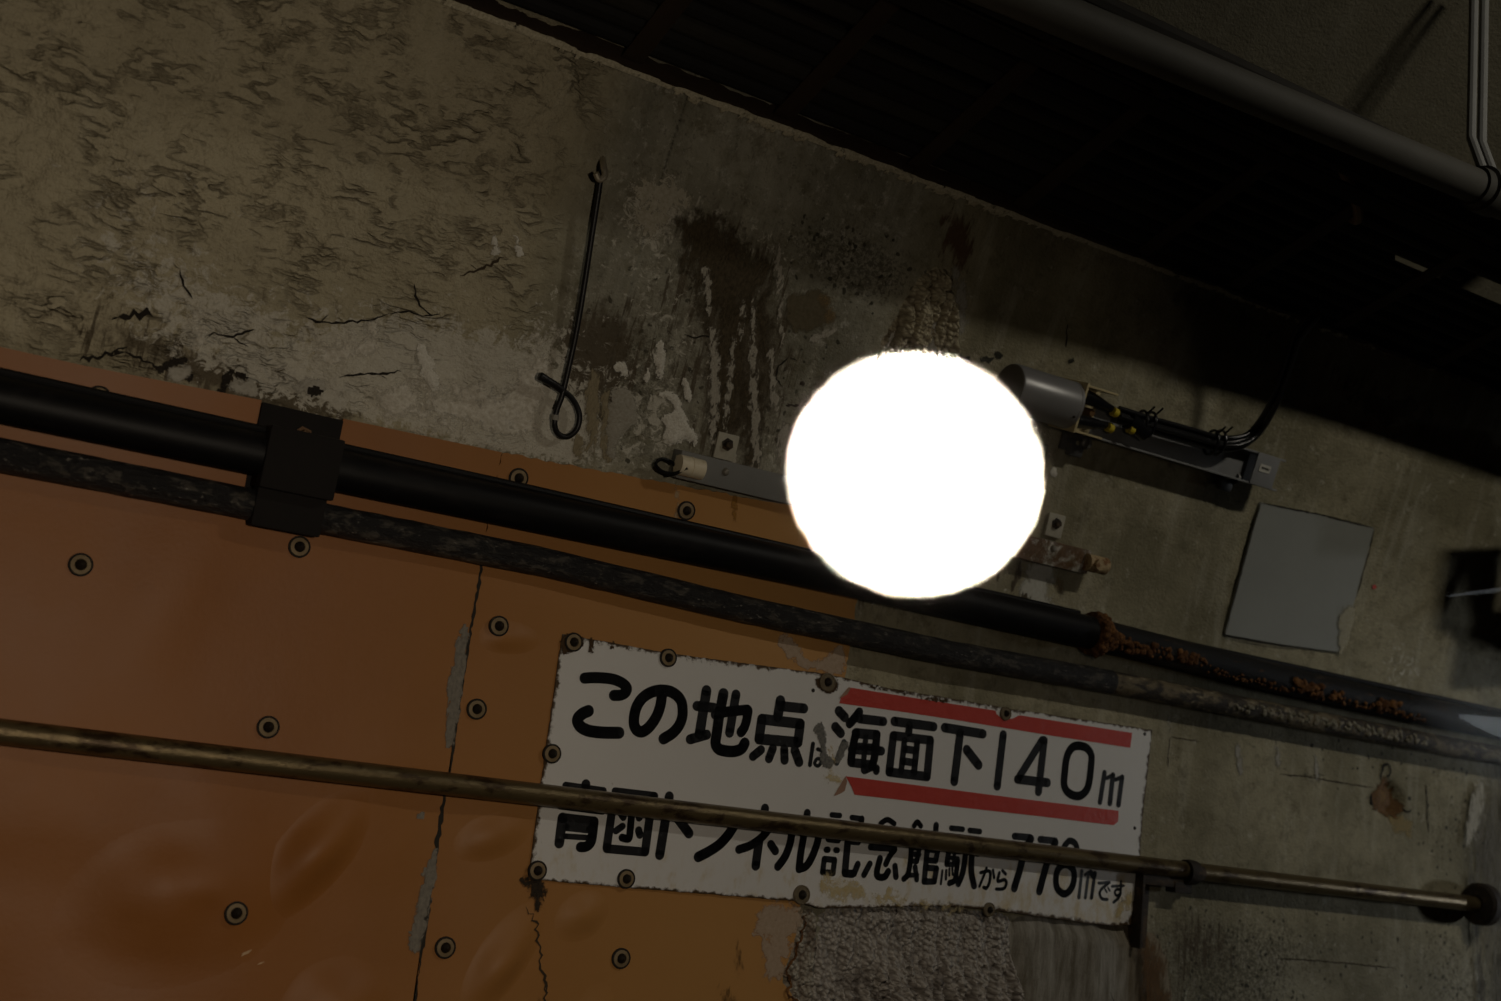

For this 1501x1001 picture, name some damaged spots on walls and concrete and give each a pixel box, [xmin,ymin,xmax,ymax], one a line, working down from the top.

crack [80,307,167,371]
crack [173,263,193,299]
crack [207,329,254,347]
crack [340,370,401,379]
crack [307,284,440,324]
leakage [572,173,837,477]
leakage [817,266,969,498]
peeling [445,624,469,748]
corrosion [1109,632,1426,722]
peeling [408,848,439,953]
crack [526,907,548,1001]
peeling [751,900,803,980]